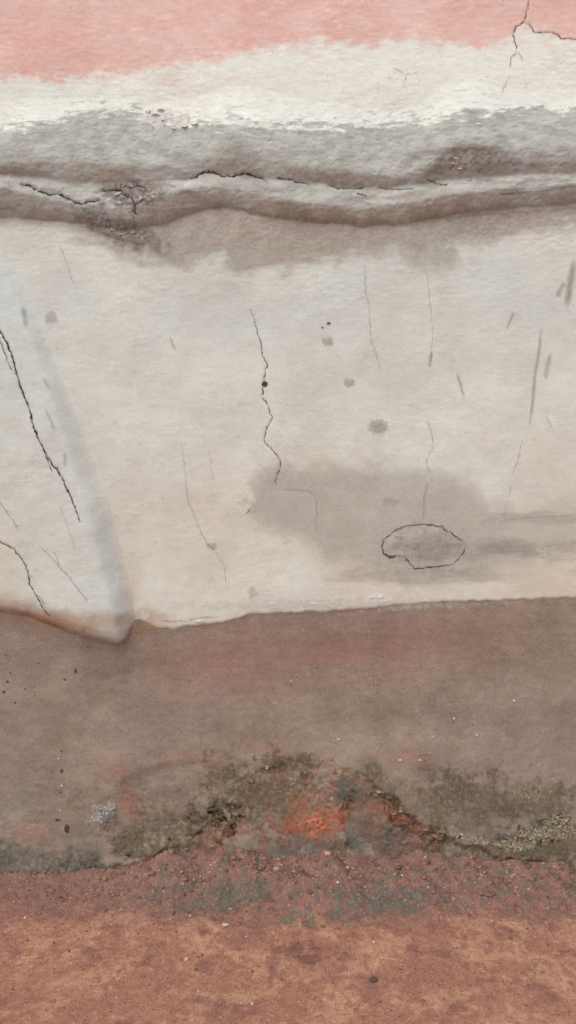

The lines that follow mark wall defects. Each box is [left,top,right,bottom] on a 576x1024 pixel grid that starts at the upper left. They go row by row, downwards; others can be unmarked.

crack [502,0,575,93]
crack [19,183,145,215]
crack [190,171,447,196]
leakage [86,195,576,268]
crack [254,319,281,485]
crack [0,331,86,616]
leakage [252,470,504,571]
crack [381,423,466,569]
flaking render [125,761,445,867]